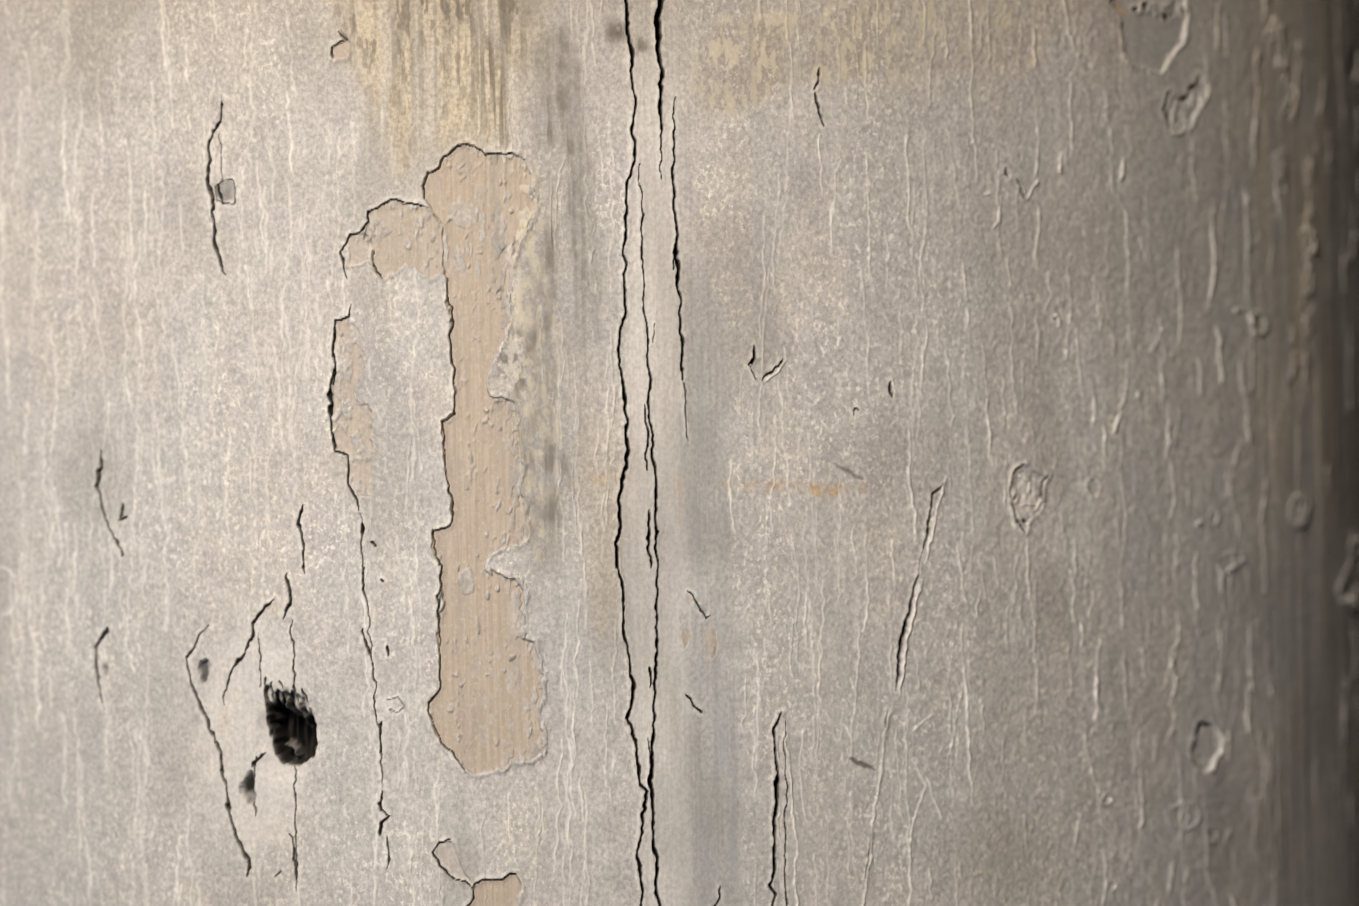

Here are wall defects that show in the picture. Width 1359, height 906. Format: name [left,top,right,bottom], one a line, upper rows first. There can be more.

peeling [329,26,353,61]
spalling [1108,0,1211,136]
crack [205,96,227,276]
peeling [326,314,377,500]
peeling [338,140,546,776]
crack [613,0,704,906]
spalling [1339,531,1359,611]
peeling [431,837,525,906]
crack [768,710,790,906]
crack [860,474,949,906]
peeling [1189,718,1226,775]